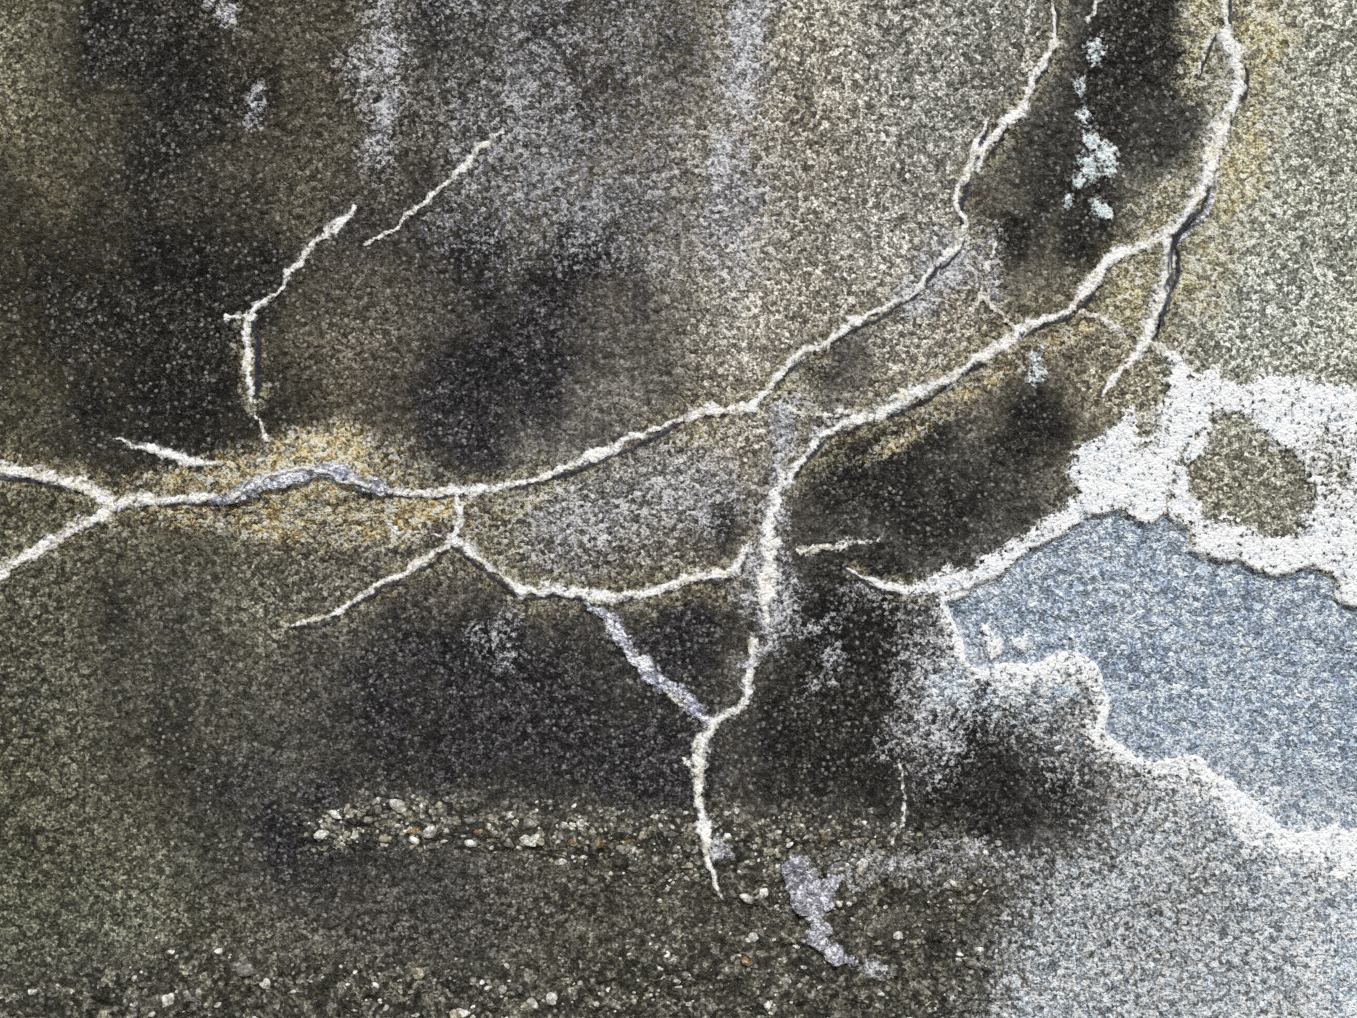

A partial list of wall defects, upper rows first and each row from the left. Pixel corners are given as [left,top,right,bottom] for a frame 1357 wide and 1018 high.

damp [0,0,787,493]
crack [0,0,1250,728]
damp [884,0,1225,324]
crack [890,763,907,847]
peeling [892,351,1357,887]